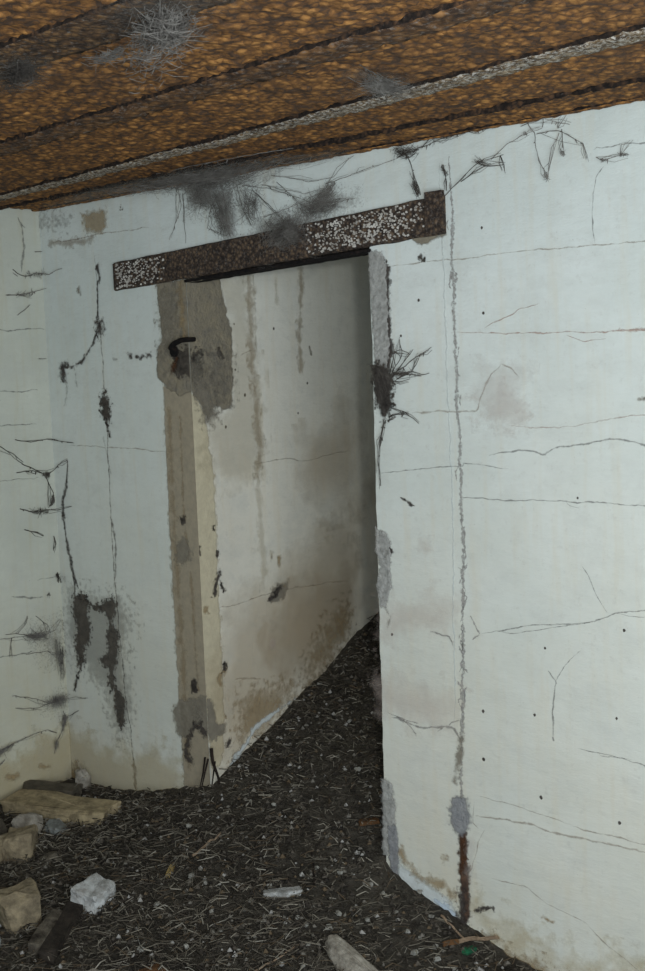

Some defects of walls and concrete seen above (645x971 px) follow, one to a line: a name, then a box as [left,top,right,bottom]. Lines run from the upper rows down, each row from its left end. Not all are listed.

crack [61,461,79,592]
crack [439,159,513,797]
leakage [70,591,127,731]
corrosion [453,737,463,784]
corrosion [449,796,471,927]